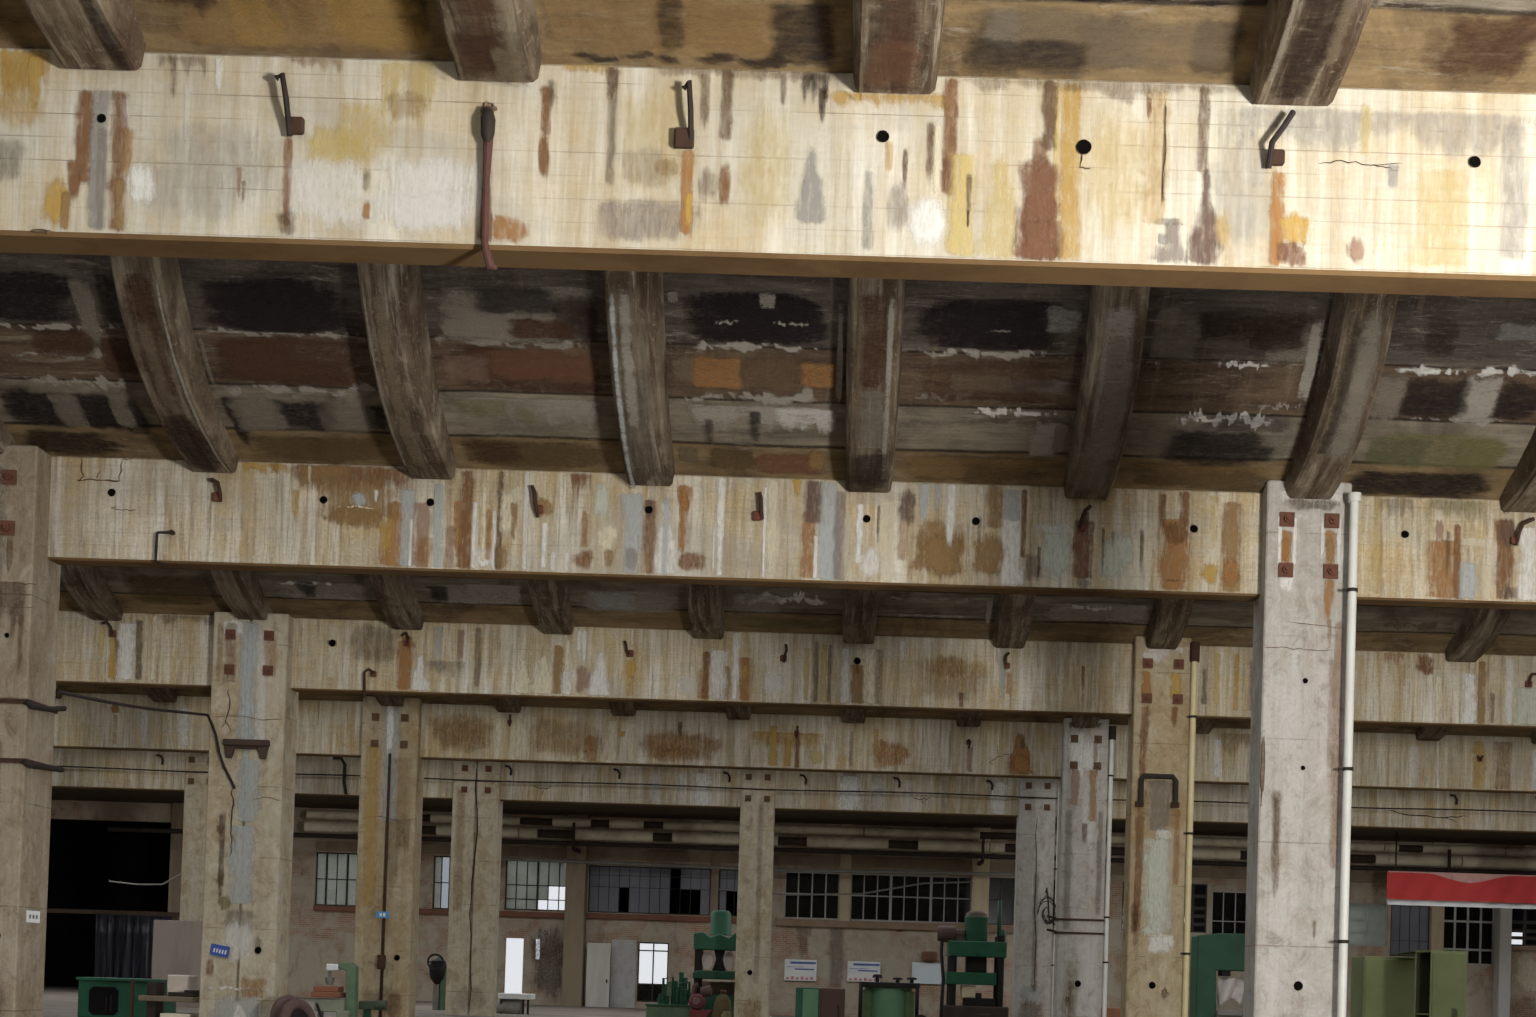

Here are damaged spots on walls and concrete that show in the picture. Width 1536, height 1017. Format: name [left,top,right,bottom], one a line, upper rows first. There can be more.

rust [702,71,734,139]
rust [44,90,93,229]
rust [109,92,132,230]
rust [280,138,292,233]
rust [679,151,730,234]
rust [1015,81,1063,260]
rust [1269,173,1309,266]
rust [1008,735,1034,775]